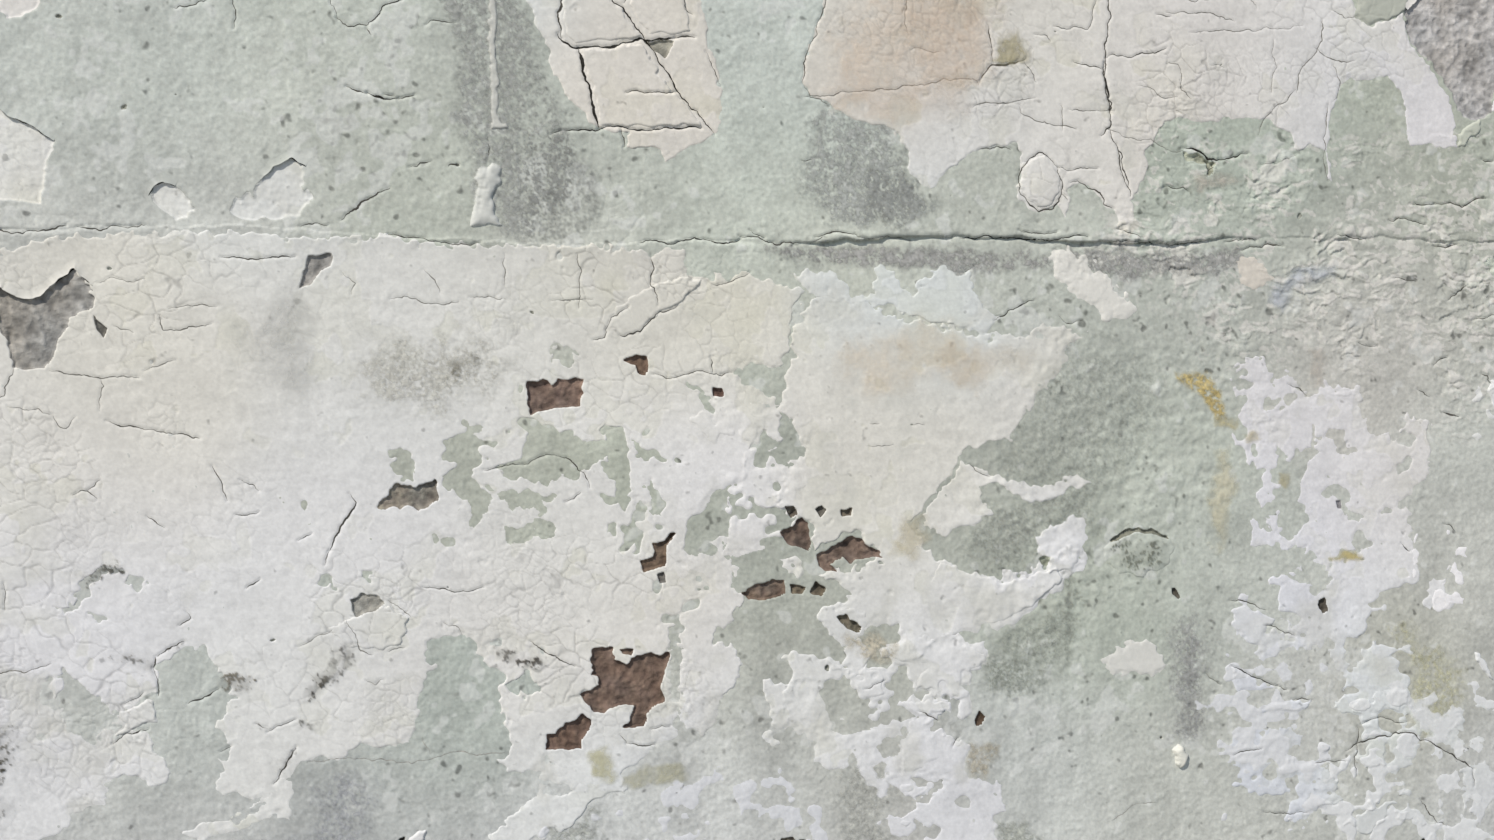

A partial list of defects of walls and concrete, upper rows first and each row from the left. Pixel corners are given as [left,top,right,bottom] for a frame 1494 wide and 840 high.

peeling [0,0,40,19]
peeling [802,0,1494,236]
crack [0,224,142,234]
crack [552,230,907,340]
crack [1,304,258,516]
crack [303,496,356,563]
crack [489,454,589,501]
peeling [0,151,1137,840]
crack [113,613,216,744]
crack [303,587,481,685]
peeling [1194,356,1494,840]